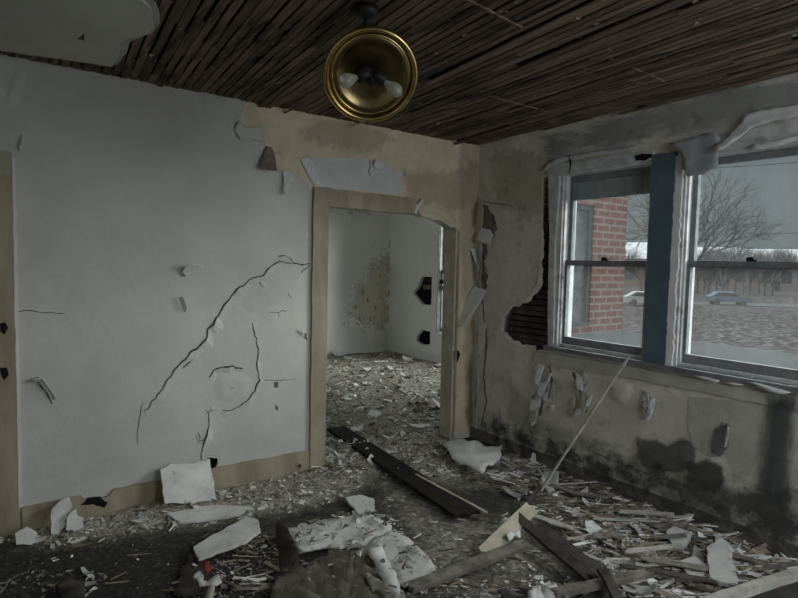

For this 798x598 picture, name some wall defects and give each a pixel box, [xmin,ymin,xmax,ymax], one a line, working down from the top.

spalling [0,0,798,456]
peeling [12,157,57,512]
crack [137,255,312,460]
spalling [205,455,219,468]
peeling [554,444,686,501]
damp [485,397,798,550]
peeling [687,397,766,477]